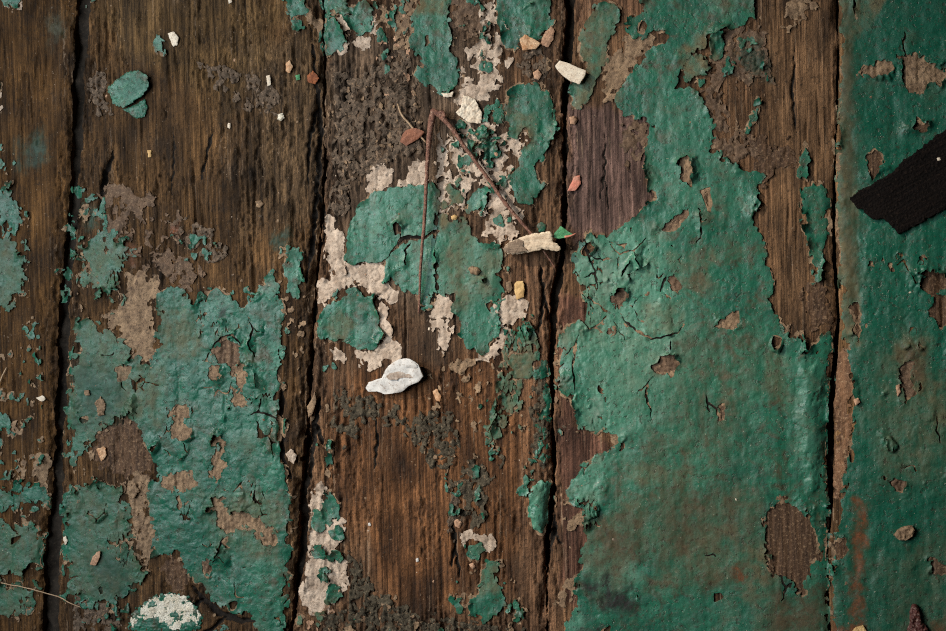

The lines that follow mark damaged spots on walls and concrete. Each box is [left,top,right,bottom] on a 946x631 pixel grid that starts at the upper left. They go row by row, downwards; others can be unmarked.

crack [306,24,326,283]
peeling [0,144,31,312]
crack [583,238,646,289]
crack [537,265,549,332]
crack [566,335,579,390]
peeling [282,0,946,631]
crack [622,316,682,350]
peeling [0,185,397,631]
crack [250,388,324,485]
crack [706,395,722,419]
crack [544,514,563,577]